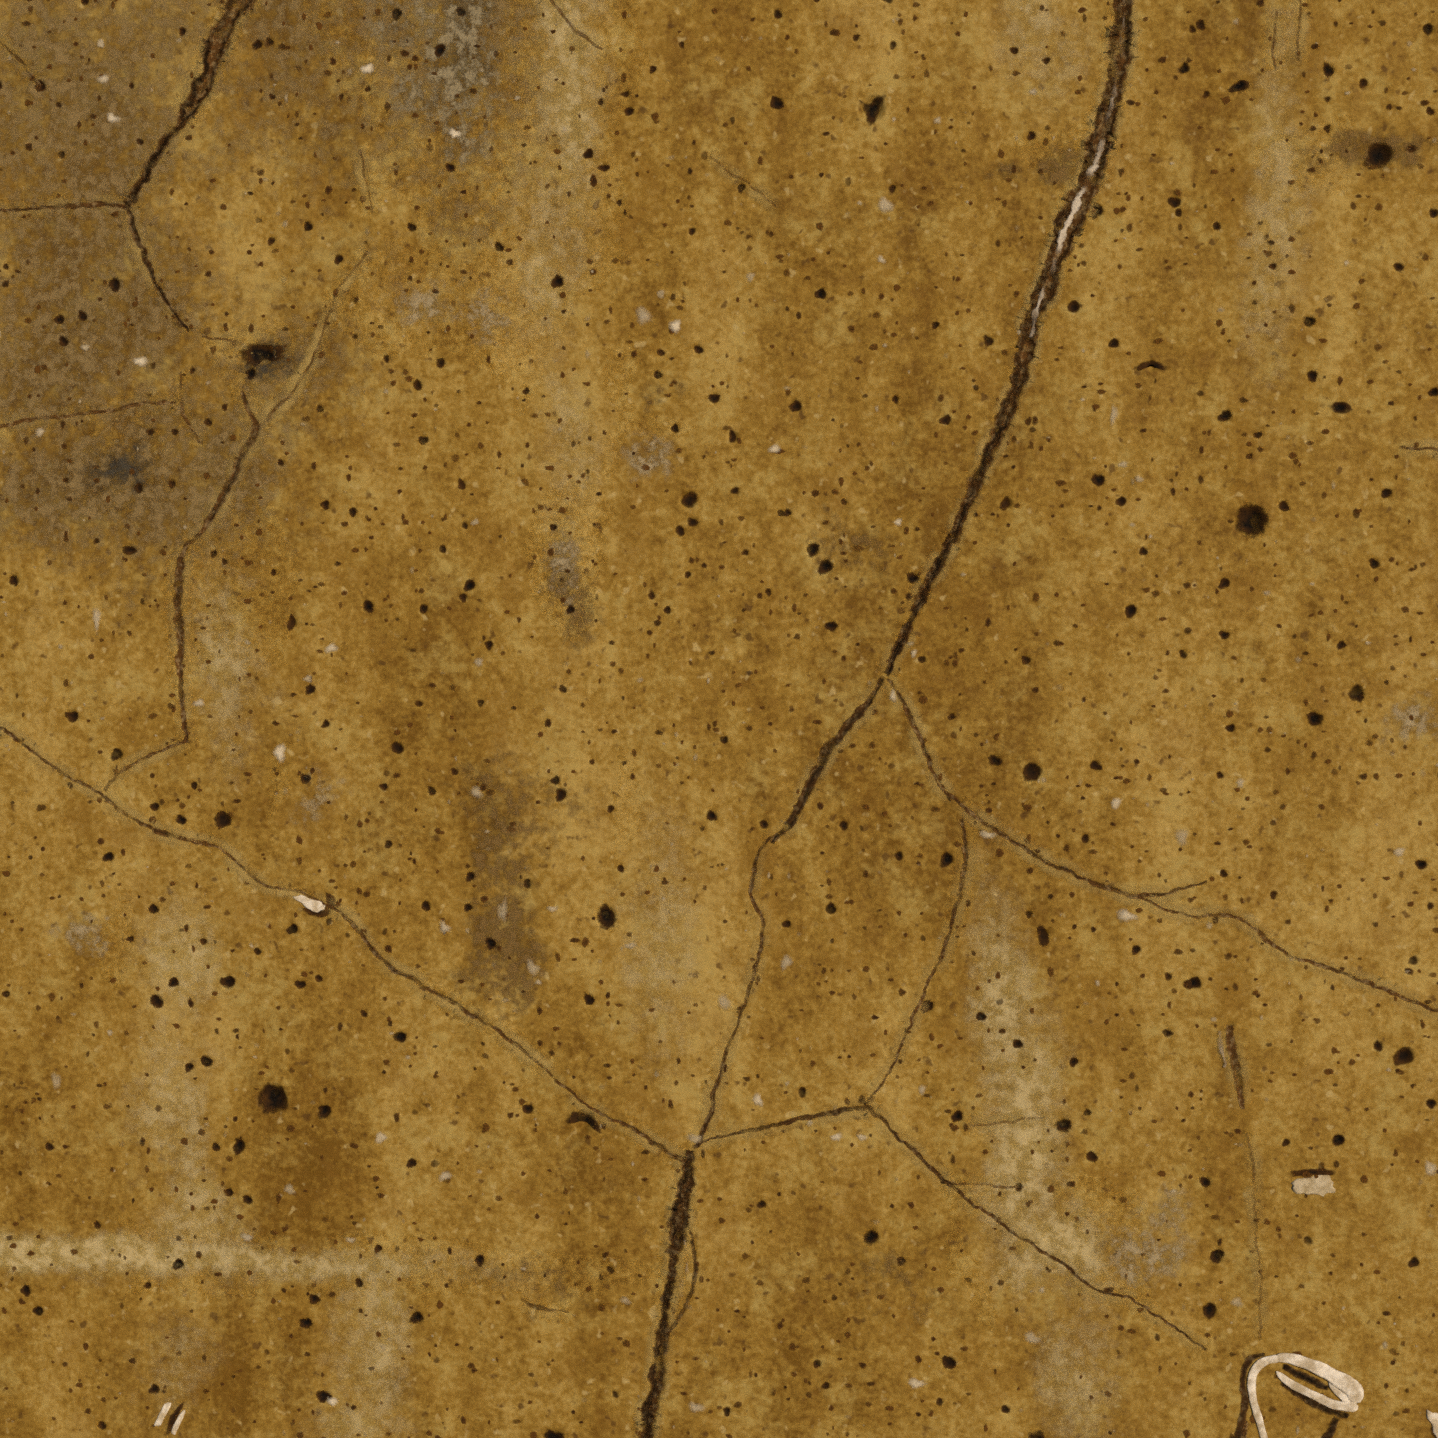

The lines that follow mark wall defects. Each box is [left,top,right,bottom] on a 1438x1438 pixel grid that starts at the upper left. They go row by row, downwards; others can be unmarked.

crack [552,0,602,49]
crack [0,0,254,341]
crack [355,151,366,191]
crack [341,276,353,290]
crack [0,374,202,444]
crack [124,328,322,771]
crack [732,0,1438,1037]
crack [0,725,1206,1438]
crack [1220,1025,1245,1109]